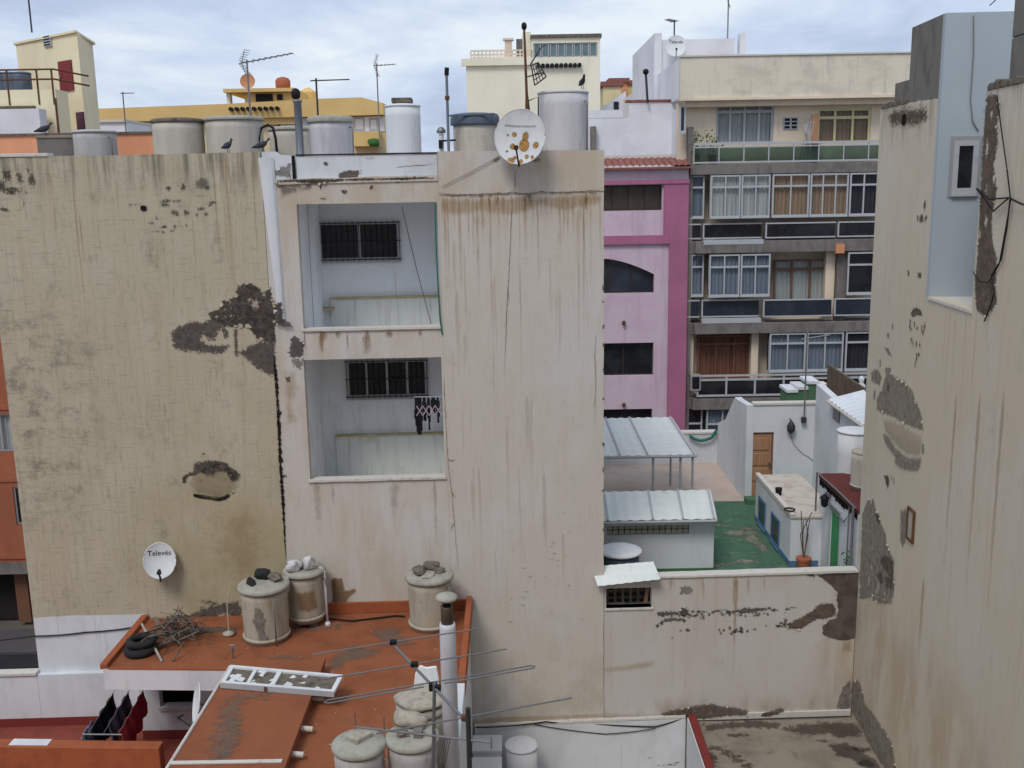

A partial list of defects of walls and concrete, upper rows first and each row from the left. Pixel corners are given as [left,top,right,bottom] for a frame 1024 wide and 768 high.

flaking render [974,94,1000,318]
flaking render [172,283,305,382]
crack [443,171,599,374]
flaking render [871,324,924,431]
crack [273,357,287,555]
flaking render [819,479,895,604]
flaking render [656,603,836,638]
flaking render [837,679,896,768]